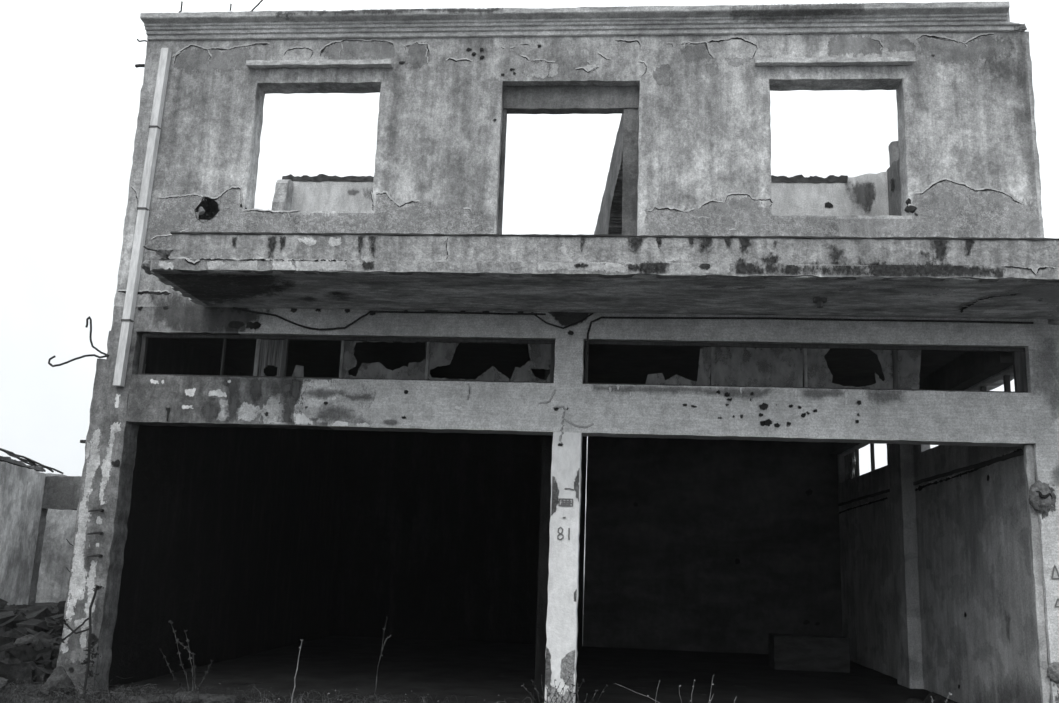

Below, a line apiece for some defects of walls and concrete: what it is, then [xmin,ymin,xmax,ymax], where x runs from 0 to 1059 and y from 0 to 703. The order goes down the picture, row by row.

peeling [324,41,430,69]
peeling [653,64,671,86]
peeling [681,43,751,76]
crack [914,178,1025,205]
peeling [143,190,495,271]
leakage [358,236,376,269]
leakage [628,237,669,274]
leakage [689,237,712,270]
peeling [166,388,196,421]
peeling [208,379,376,427]
peeling [60,422,121,695]
spalling [545,646,575,703]